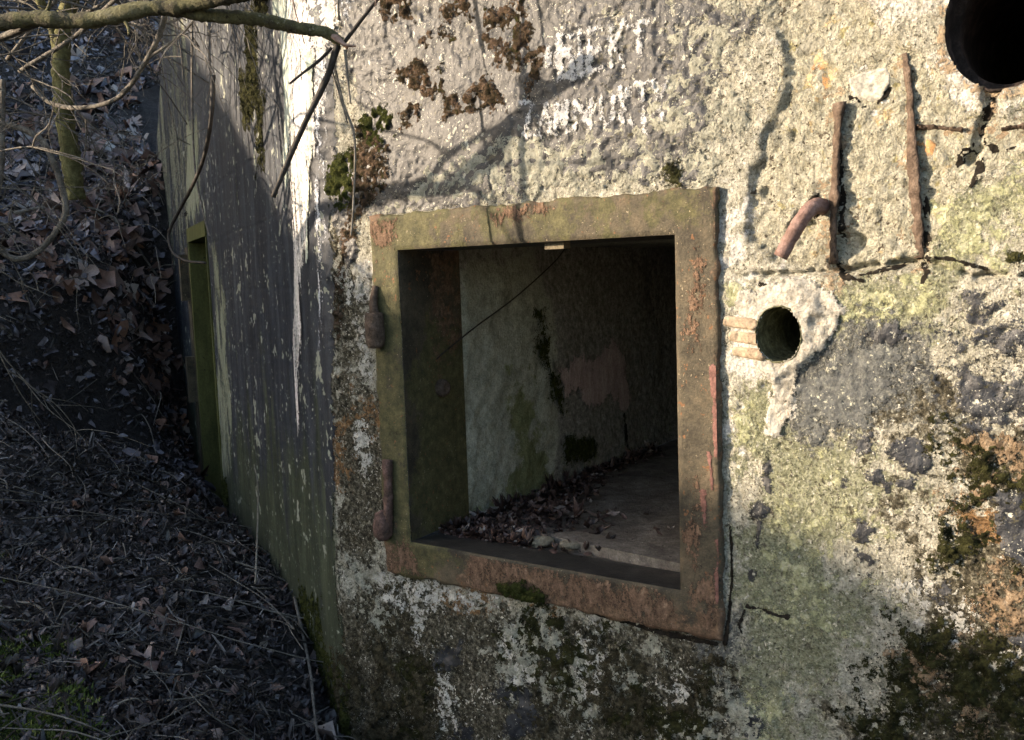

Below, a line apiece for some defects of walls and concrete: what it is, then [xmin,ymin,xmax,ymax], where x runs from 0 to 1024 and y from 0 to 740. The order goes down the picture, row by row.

spalling [736,0,1024,279]
crack [955,92,1016,188]
rust [370,218,398,263]
rust [680,246,712,353]
peeling [156,0,764,740]
peeling [784,279,1024,494]
rust [463,474,719,632]
peeling [842,516,880,578]
peeling [988,481,1024,567]
peeling [880,563,981,653]
peeling [989,632,1024,691]